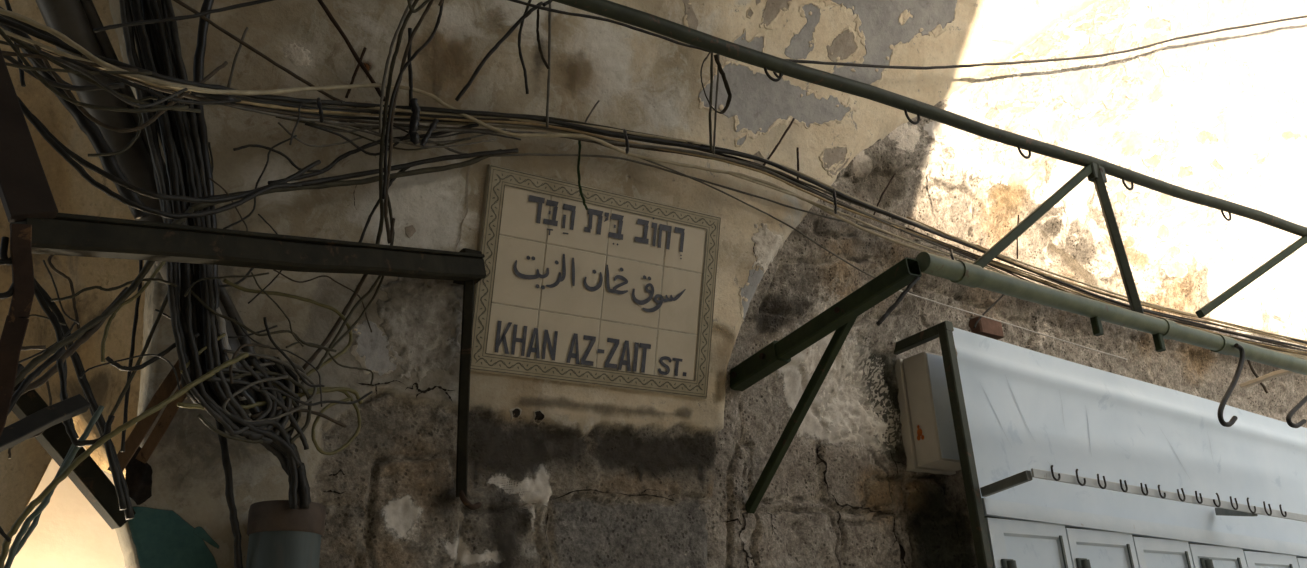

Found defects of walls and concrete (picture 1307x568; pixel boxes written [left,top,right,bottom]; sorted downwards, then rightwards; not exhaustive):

flaking render [698,0,957,165]
flaking render [923,51,1100,143]
flaking render [1059,0,1307,84]
flaking render [1105,177,1134,207]
flaking render [1123,236,1136,248]
flaking render [1154,163,1206,278]
flaking render [1250,171,1307,259]
water stain [520,398,659,415]
water stain [444,428,552,568]
crack [816,448,908,568]